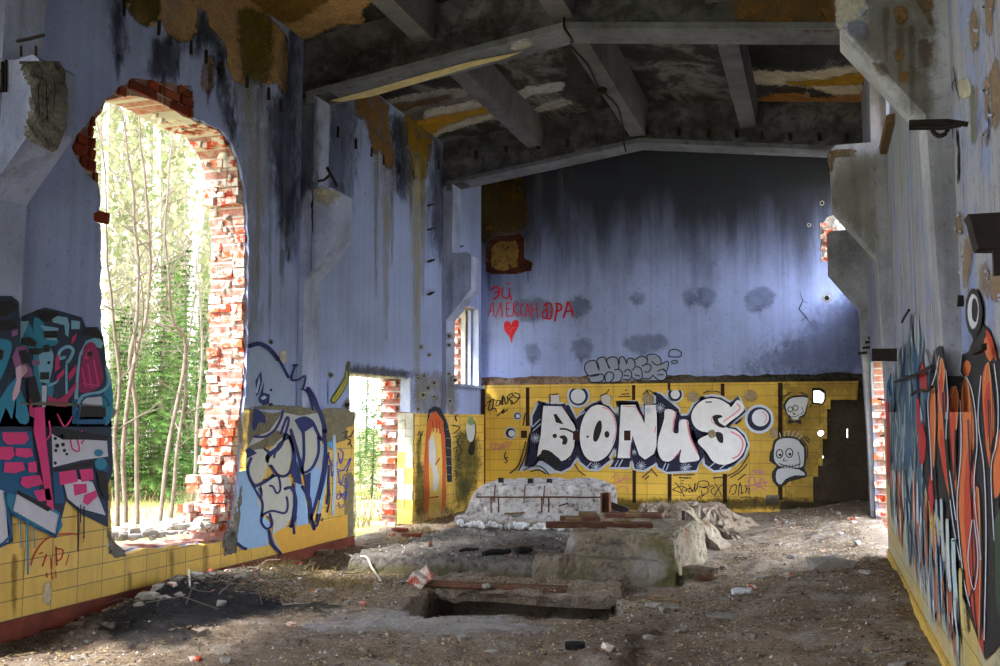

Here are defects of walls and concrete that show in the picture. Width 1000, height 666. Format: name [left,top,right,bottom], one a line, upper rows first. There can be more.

flaking render [117,0,371,118]
damp [510,39,532,50]
peeling [966,0,994,52]
spalling [19,61,98,182]
damp [518,82,573,113]
flaking render [758,90,863,102]
peeling [980,60,1000,145]
flaking render [94,210,110,224]
corrosion [355,94,491,333]
spalling [486,233,533,274]
peeling [953,211,1000,302]
spalling [222,486,242,556]